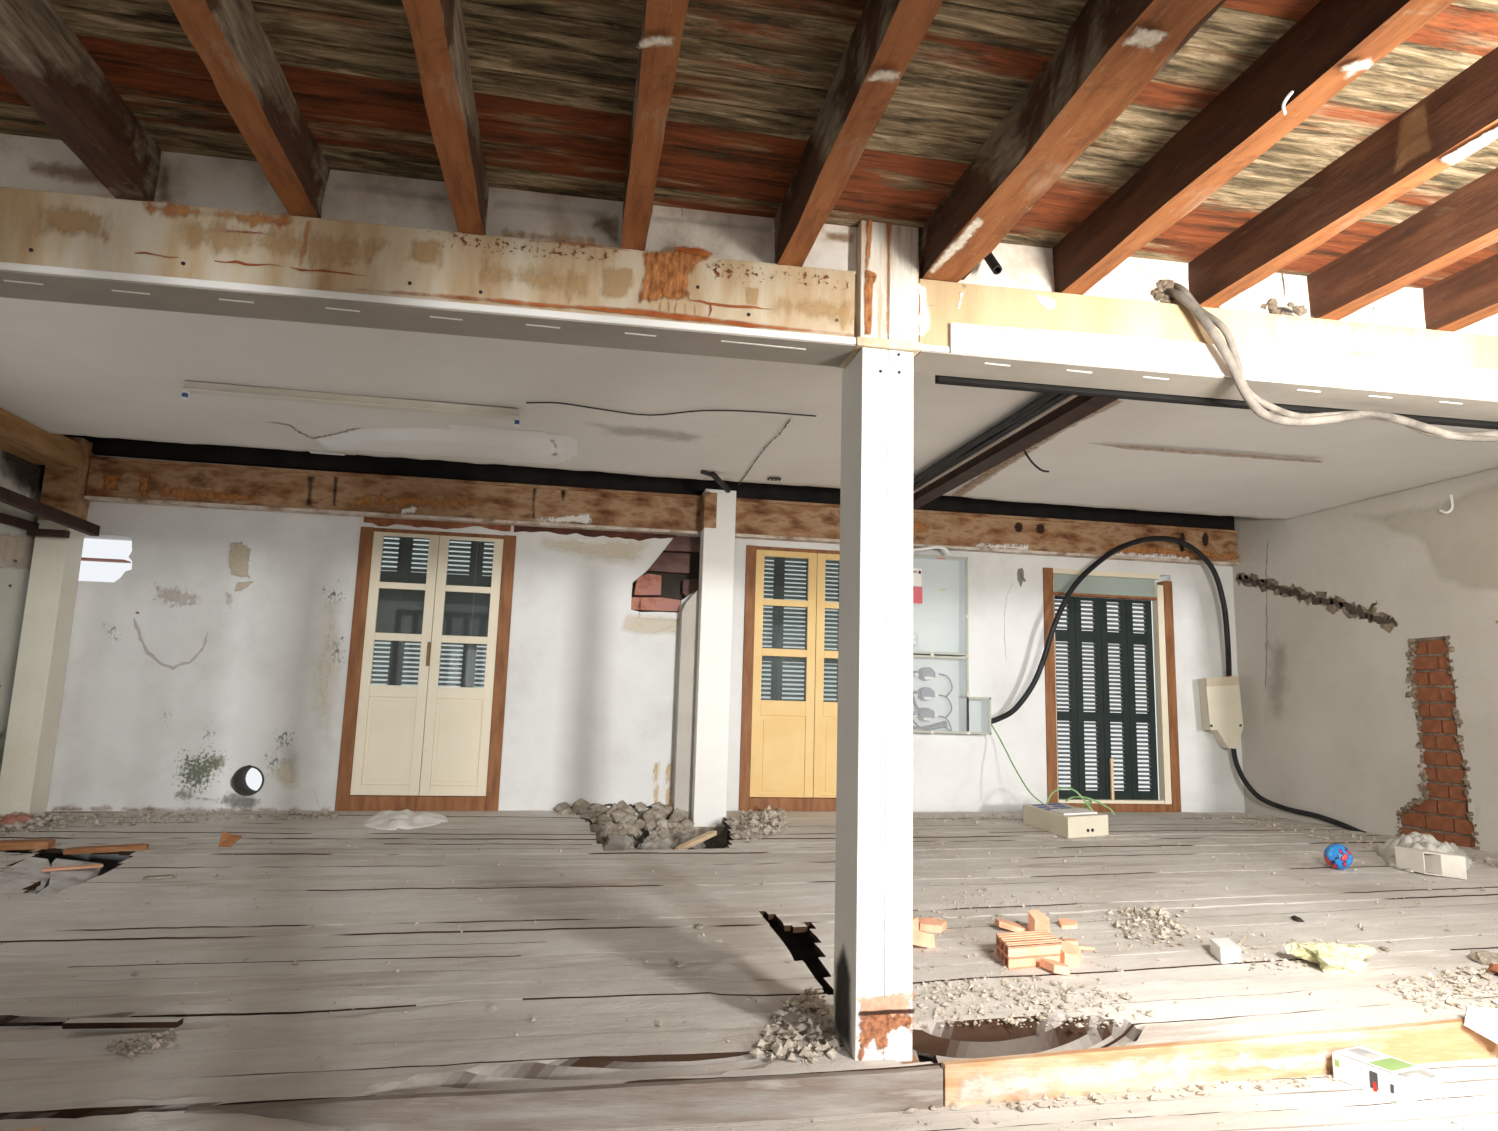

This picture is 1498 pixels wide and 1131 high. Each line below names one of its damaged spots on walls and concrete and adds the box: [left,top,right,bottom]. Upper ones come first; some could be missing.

rust [146,201,199,217]
rust [209,212,365,276]
rust [397,219,891,334]
peeling [0,534,34,568]
peeling [229,542,252,591]
flaking render [364,506,700,636]
leakage [165,732,224,797]
flaking render [1395,635,1480,850]
rust [834,952,915,1061]